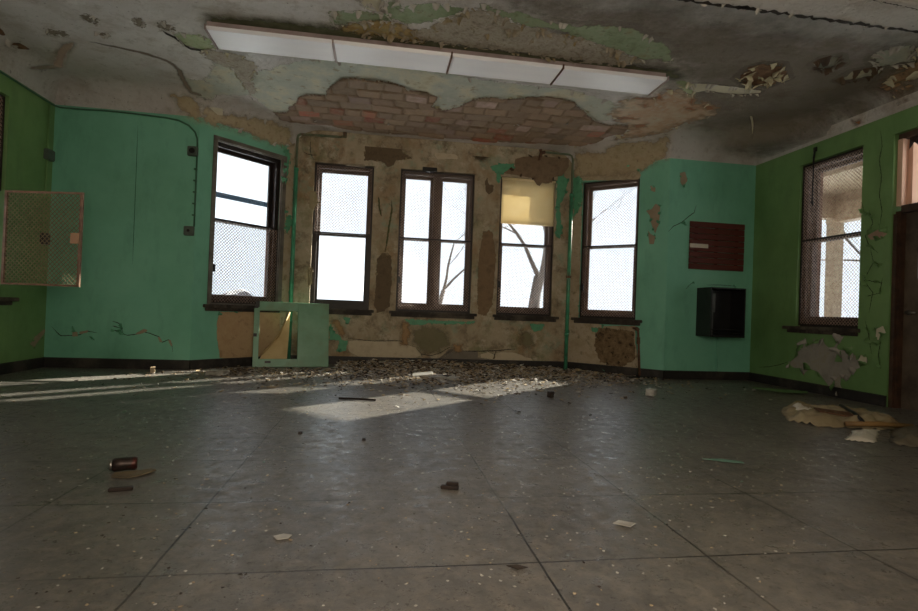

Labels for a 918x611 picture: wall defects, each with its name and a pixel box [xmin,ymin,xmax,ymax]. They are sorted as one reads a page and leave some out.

flaking render [328,0,674,68]
peeling [676,63,790,98]
peeling [813,45,917,85]
flaking render [131,18,641,371]
crack [858,131,883,368]
crack [52,321,173,352]
peeling [786,333,868,396]